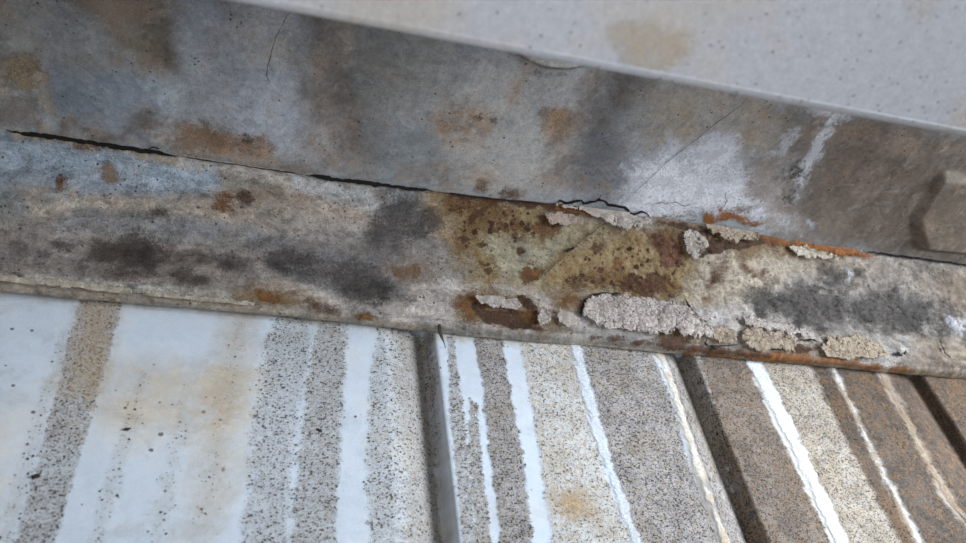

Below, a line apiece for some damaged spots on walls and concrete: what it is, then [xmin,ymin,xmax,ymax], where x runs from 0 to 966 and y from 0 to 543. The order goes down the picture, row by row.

rust [213,190,256,212]
crack [7,98,747,282]
leakage [614,113,840,239]
leakage [84,226,174,288]
leakage [174,268,209,291]
leakage [268,247,416,306]
rust [425,179,874,334]
crack [865,251,966,266]
peeling [537,292,888,360]
rust [591,328,916,374]